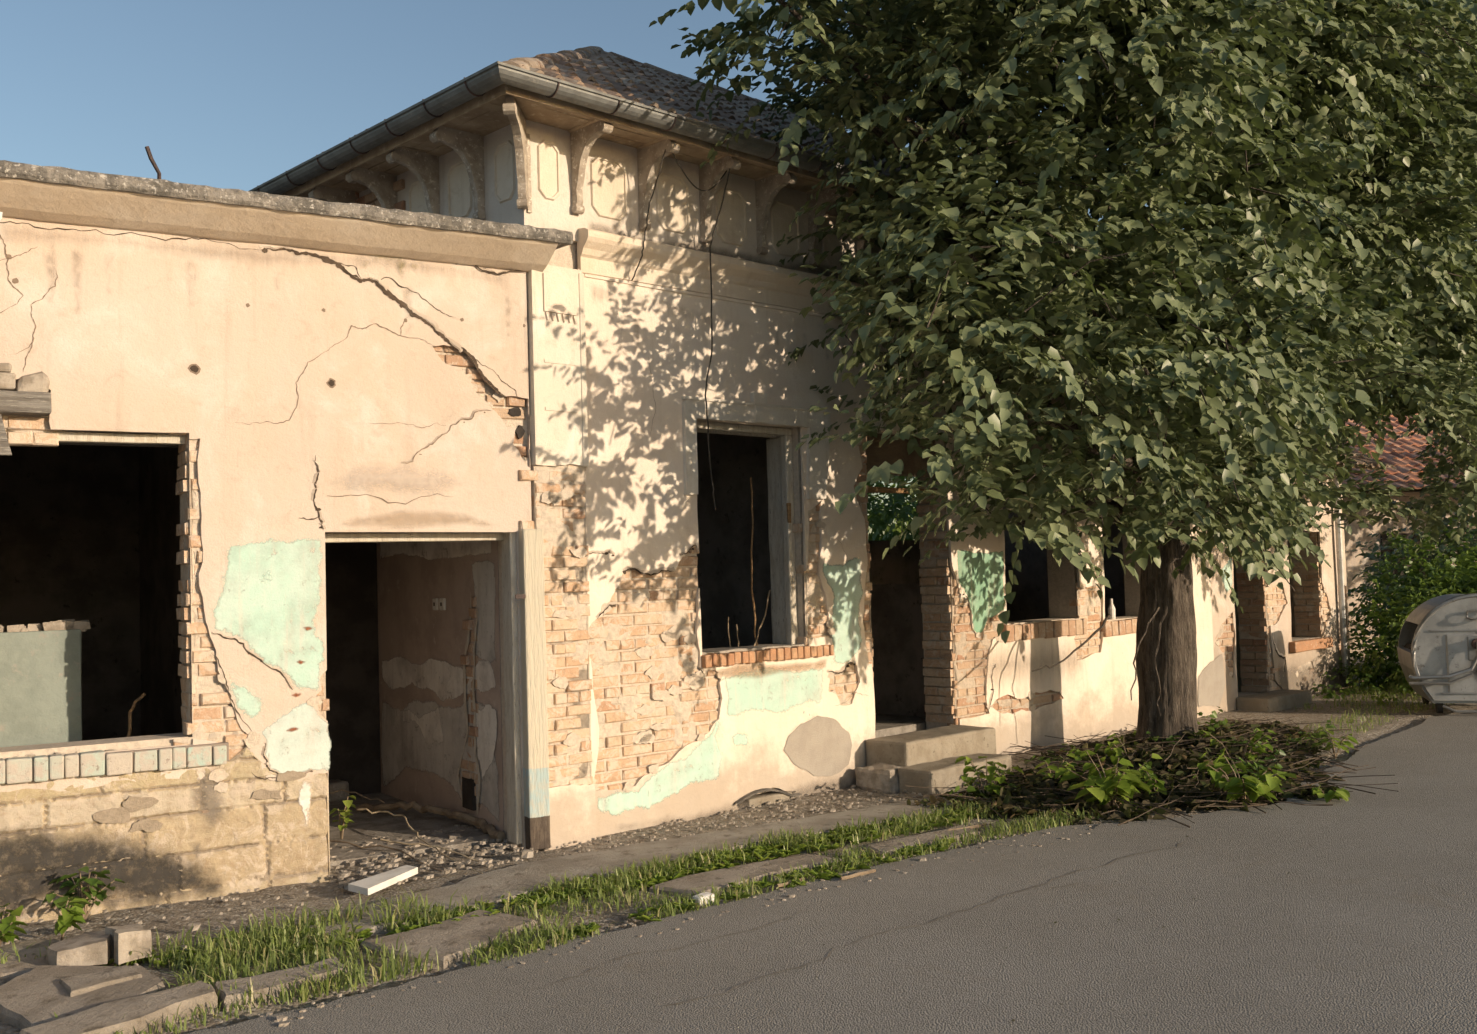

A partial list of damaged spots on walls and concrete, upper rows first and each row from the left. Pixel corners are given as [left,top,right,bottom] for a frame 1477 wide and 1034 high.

crack [0,221,518,464]
damp [0,833,216,911]
flaking render [0,433,331,923]
damp [199,775,218,819]
crack [303,455,326,529]
peeling [380,541,499,821]
flaking render [433,346,881,815]